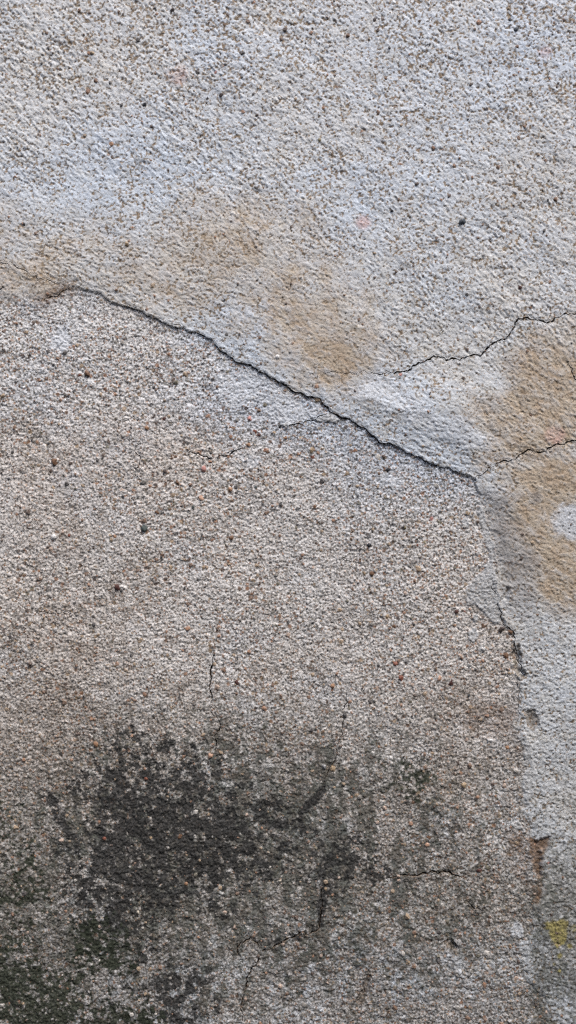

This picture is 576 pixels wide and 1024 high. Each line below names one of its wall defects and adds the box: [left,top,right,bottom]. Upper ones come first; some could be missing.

crack [0,260,576,484]
spalling [0,279,555,1024]
crack [340,557,362,565]
crack [490,584,525,725]
leakage [0,697,404,1024]